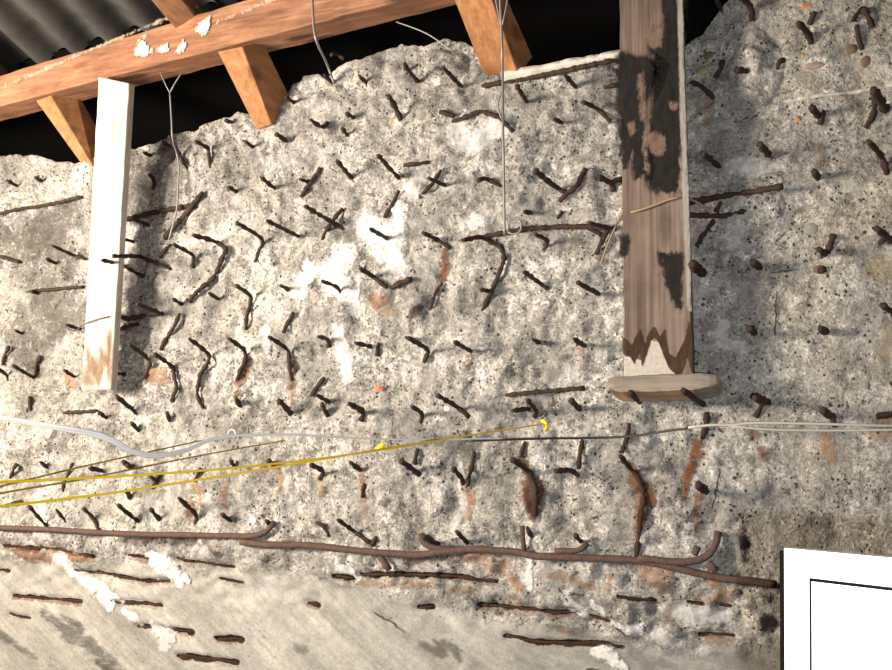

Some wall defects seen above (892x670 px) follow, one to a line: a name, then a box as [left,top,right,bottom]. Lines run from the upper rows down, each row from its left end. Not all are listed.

spalling [101,191,204,278]
rust [436,248,450,296]
spalling [461,167,617,311]
spalling [128,234,228,422]
peeling [624,341,675,376]
spalling [0,423,777,588]
rust [519,457,546,520]
rust [627,460,656,544]
rust [679,439,704,537]
water stain [53,551,177,652]
water stain [144,550,190,587]
water stain [590,645,628,670]